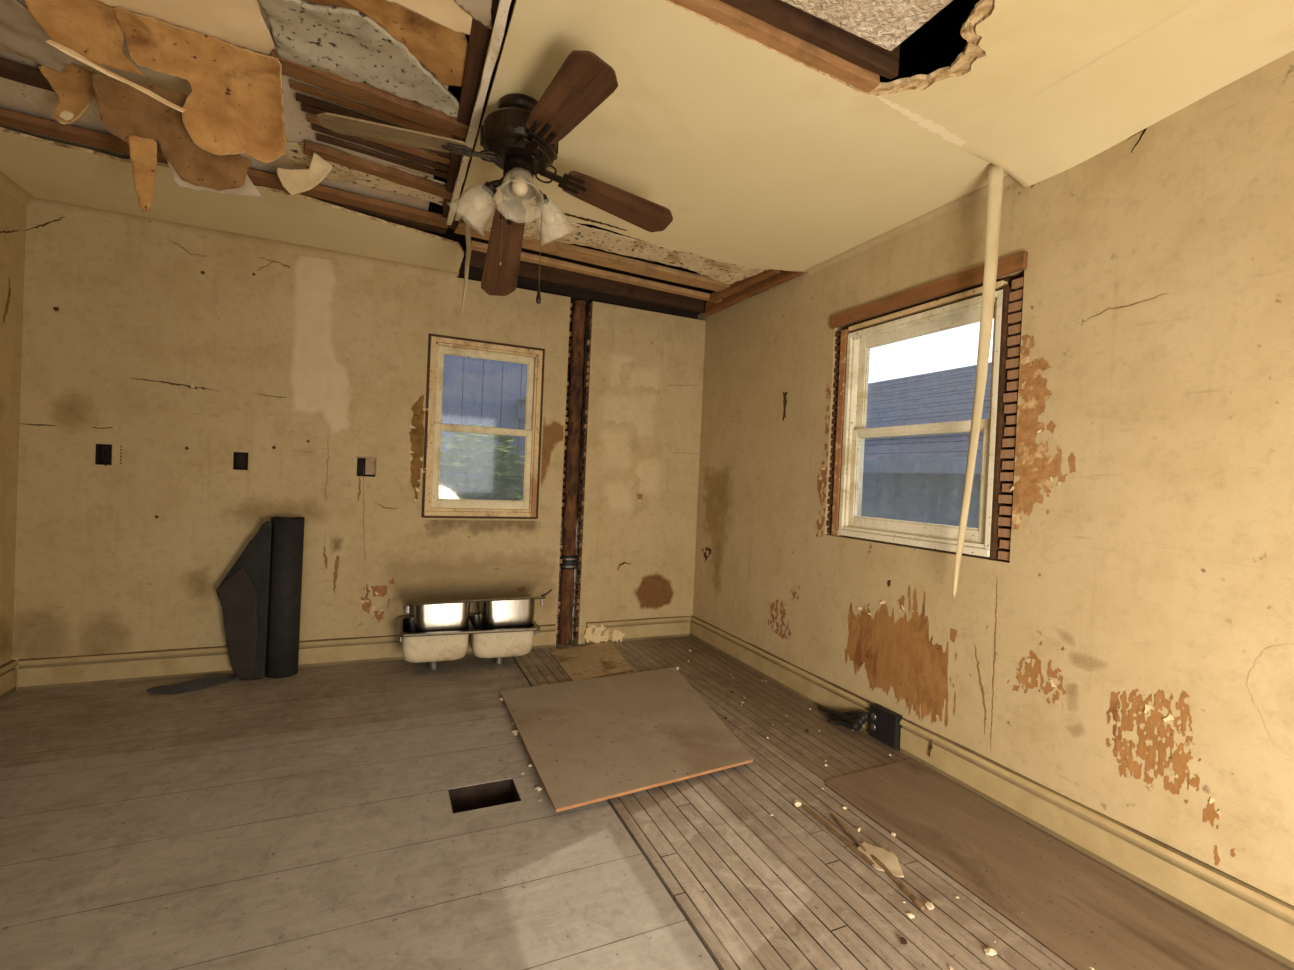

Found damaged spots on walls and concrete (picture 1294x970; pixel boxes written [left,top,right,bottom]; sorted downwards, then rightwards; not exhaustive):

crack [131,378,217,391]
flaking render [409,395,428,502]
flaking render [1010,334,1076,531]
peeling [361,578,398,622]
peeling [768,586,800,640]
peeling [845,580,957,727]
peeling [1007,650,1066,704]
peeling [1106,689,1236,866]